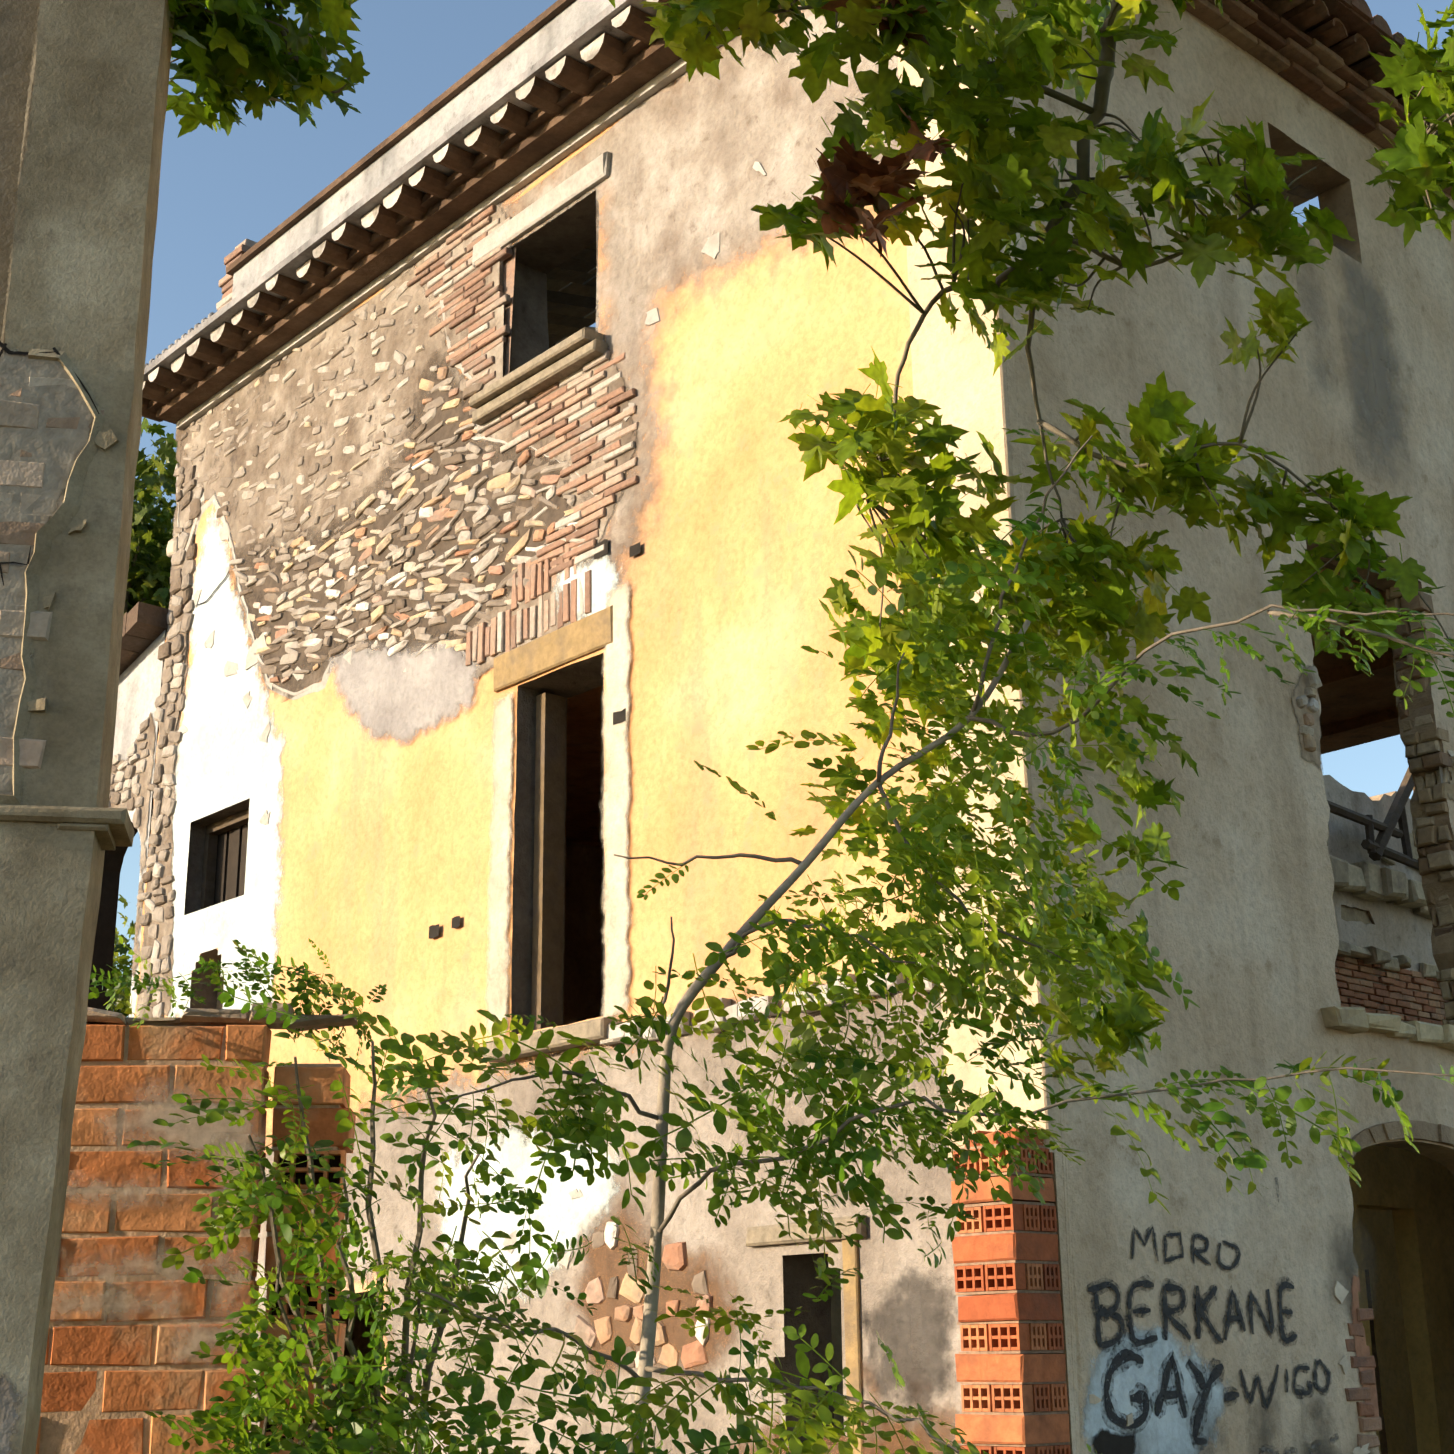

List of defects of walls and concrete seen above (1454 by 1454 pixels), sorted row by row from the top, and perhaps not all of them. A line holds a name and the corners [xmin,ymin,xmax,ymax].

spalling [0,348,119,805]
spalling [108,204,639,1017]
spalling [1292,666,1323,769]
spalling [438,1123,734,1372]
spalling [1333,1275,1382,1454]